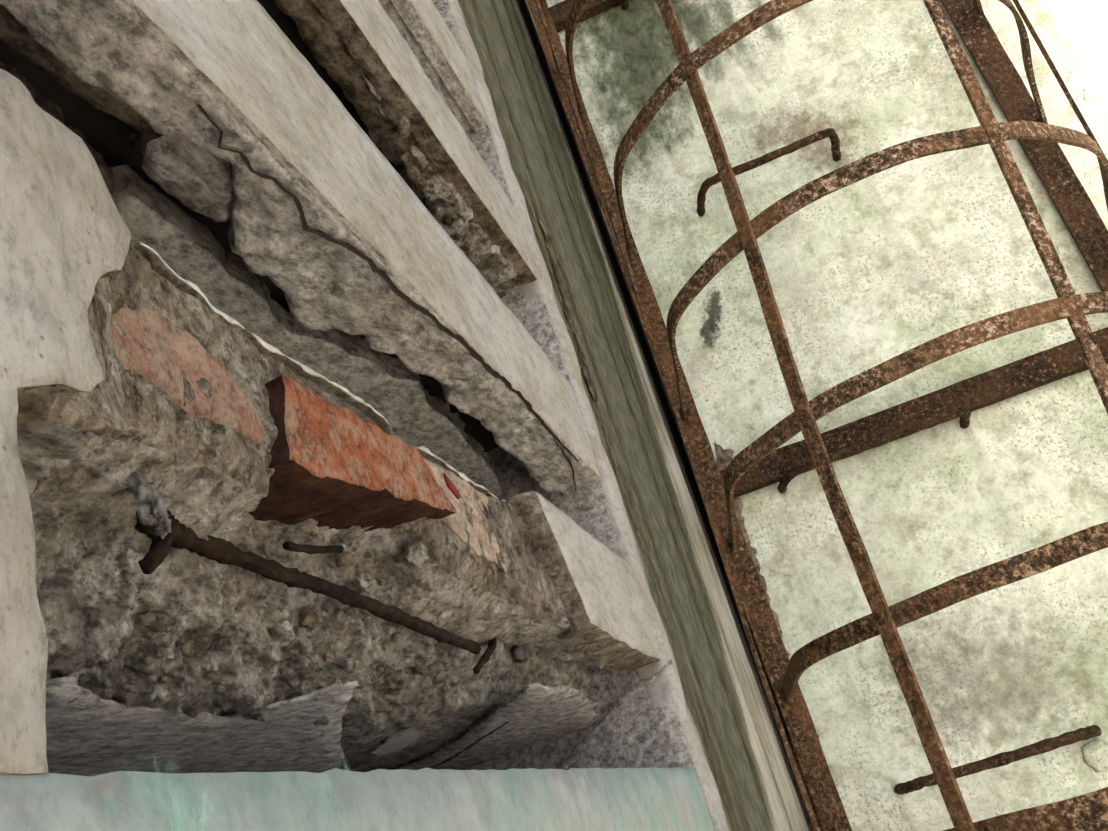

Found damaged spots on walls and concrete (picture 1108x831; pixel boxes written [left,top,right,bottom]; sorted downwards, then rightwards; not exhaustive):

spalling [0,0,619,777]
crack [197,104,578,491]